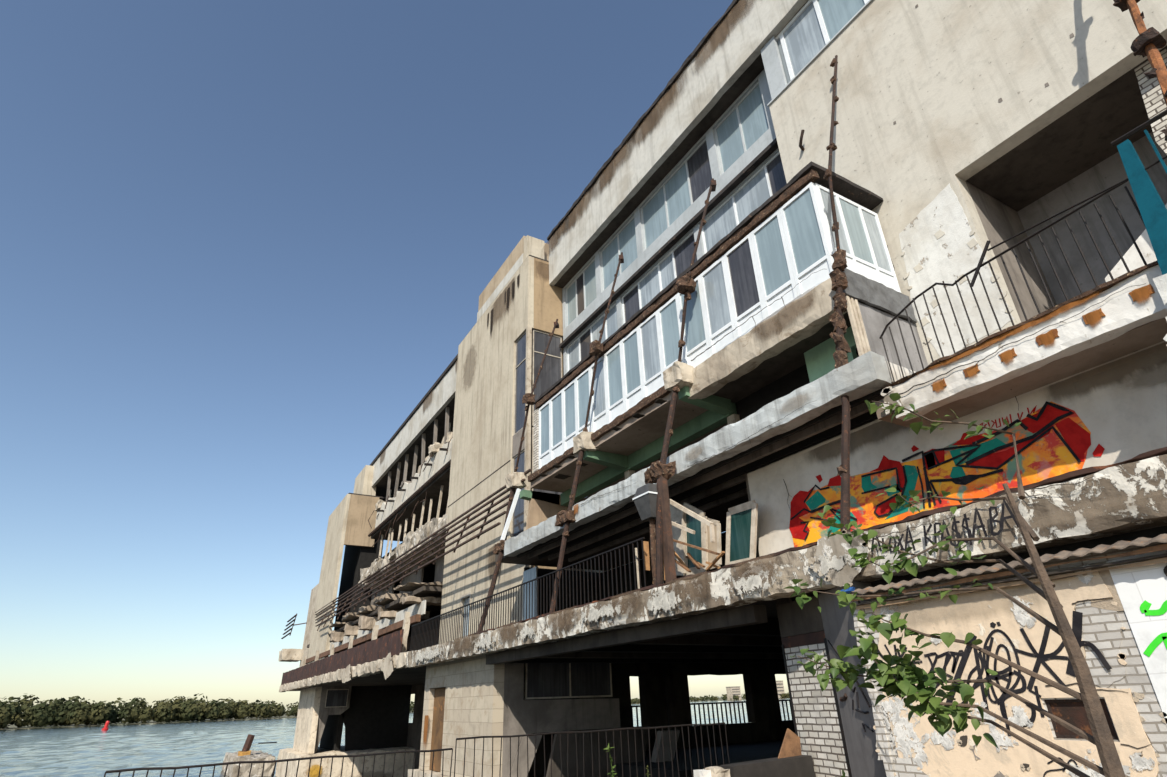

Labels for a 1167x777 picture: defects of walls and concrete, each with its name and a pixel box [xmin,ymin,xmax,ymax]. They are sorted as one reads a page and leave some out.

leakage [538,0,753,278]
peeling [571,604,623,623]
peeling [646,590,690,615]
peeling [726,570,783,595]
spalling [808,529,900,587]
peeling [1009,596,1036,629]
spalling [381,653,393,680]
peeling [859,599,980,777]
spalling [1075,600,1127,688]
peeling [970,701,1034,752]
spalling [1122,692,1167,777]
peeling [1069,749,1105,777]